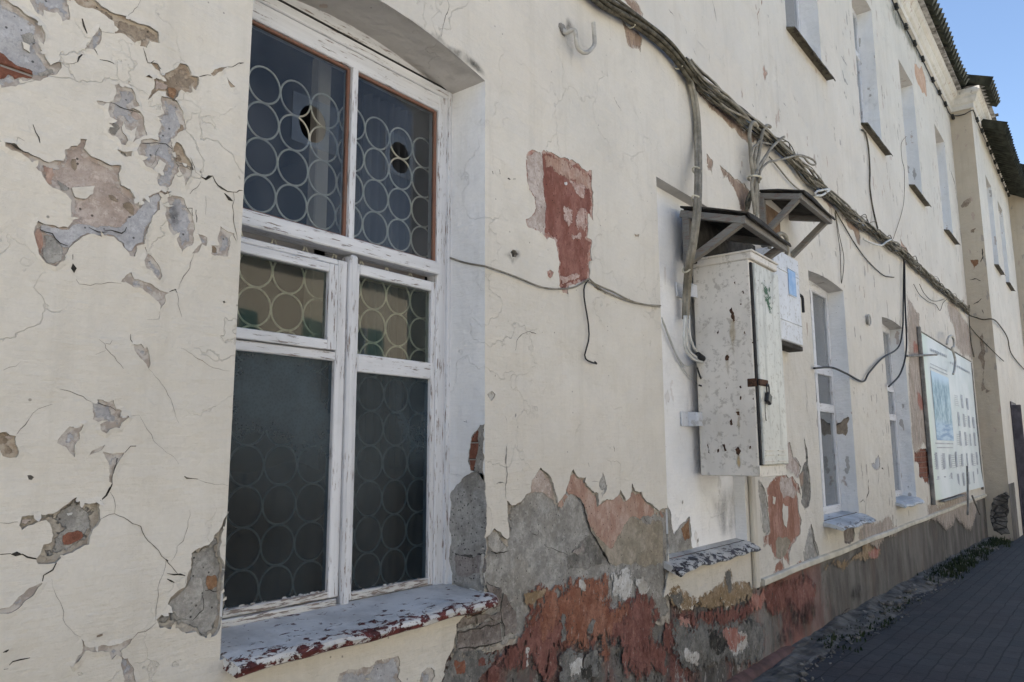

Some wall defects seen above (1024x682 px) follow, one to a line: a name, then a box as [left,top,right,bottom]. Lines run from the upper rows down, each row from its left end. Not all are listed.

flaking render [0,0,242,320]
crack [191,159,243,234]
peeling [526,149,616,303]
peeling [907,292,929,484]
crack [0,551,37,559]
flaking render [0,389,229,682]
flaking render [420,421,897,682]
flaking render [990,492,1010,535]
peeling [337,656,401,682]